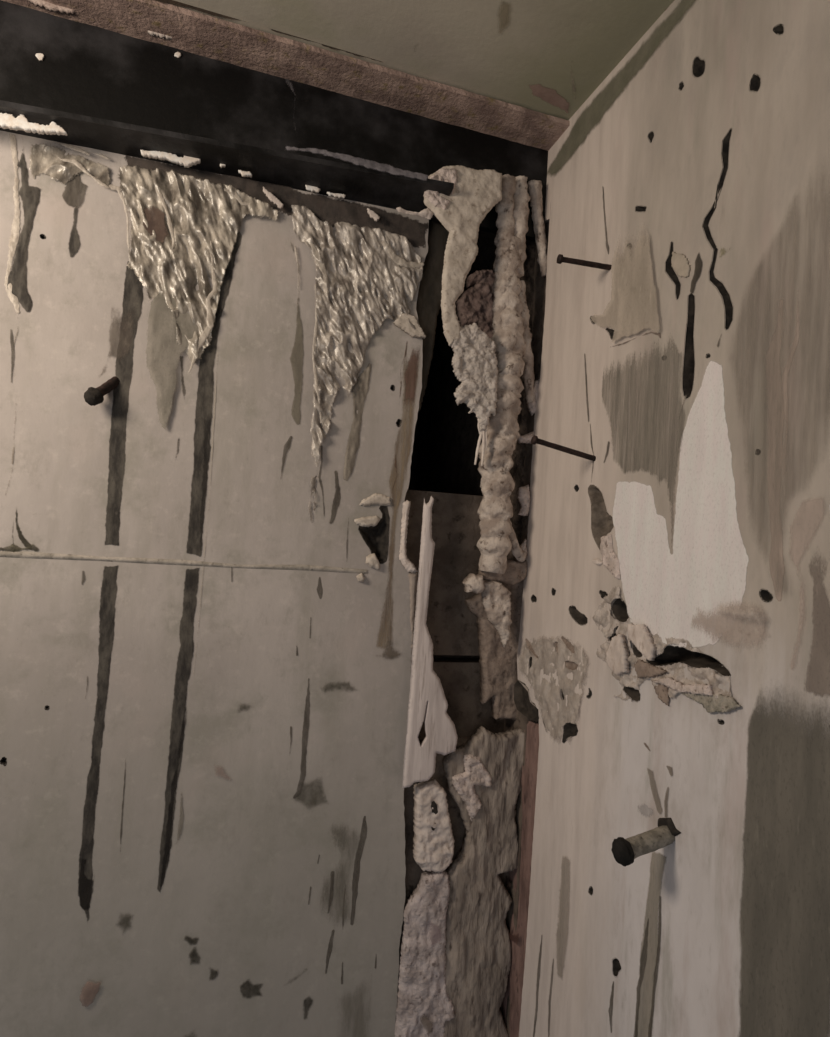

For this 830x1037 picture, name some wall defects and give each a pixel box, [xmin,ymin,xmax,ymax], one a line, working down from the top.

leakage [10,330,18,382]
leakage [4,134,40,313]
leakage [78,566,118,920]
leakage [105,261,143,546]
leakage [157,232,242,892]
flaking render [29,141,426,524]
spalling [346,493,391,582]
flaking render [499,353,749,1037]
crack [665,128,733,419]
spalling [759,589,773,602]
leakage [739,699,830,1037]
leakage [806,560,830,696]